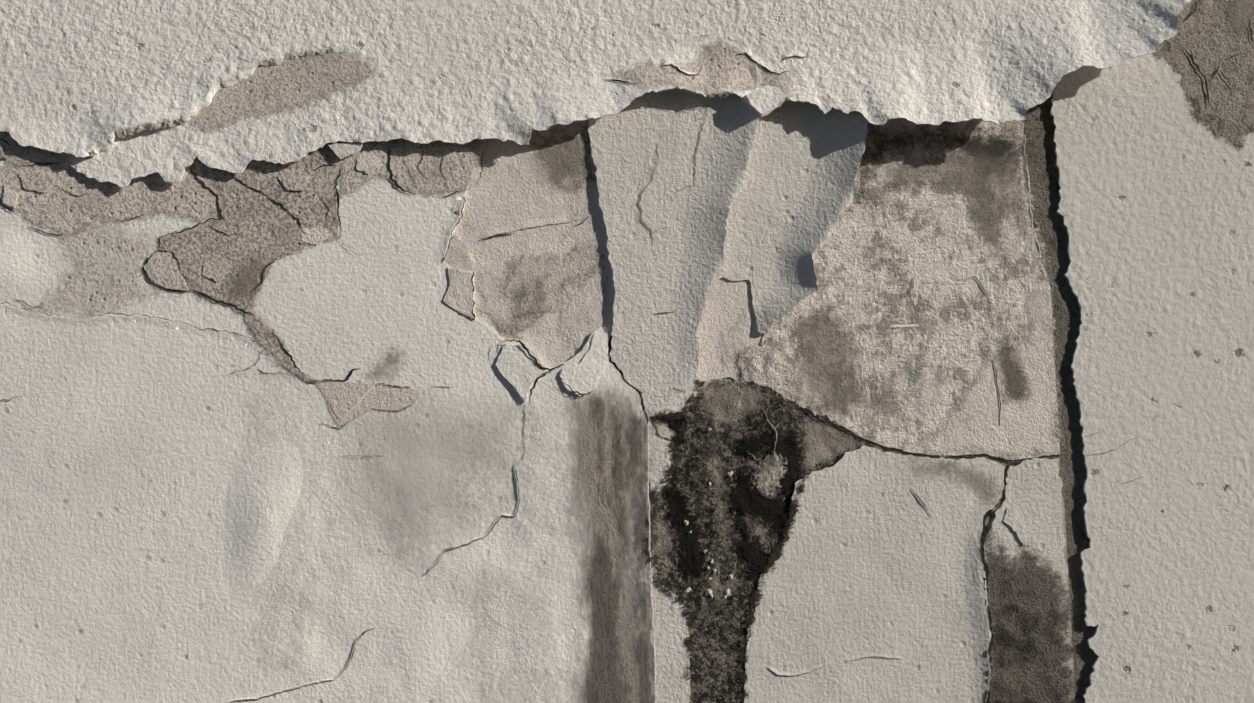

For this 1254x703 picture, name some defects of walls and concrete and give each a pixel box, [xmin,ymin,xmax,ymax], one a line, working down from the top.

crack [0,164,451,461]
crack [225,629,372,703]
crack [387,142,488,263]
crack [457,272,475,321]
crack [423,339,594,576]
leakage [461,571,565,703]
peeling [0,0,1254,497]
flaking render [650,539,691,703]
leakage [525,377,875,703]
flaking render [738,118,1079,703]
crack [766,398,1137,703]
leakage [993,337,1031,418]